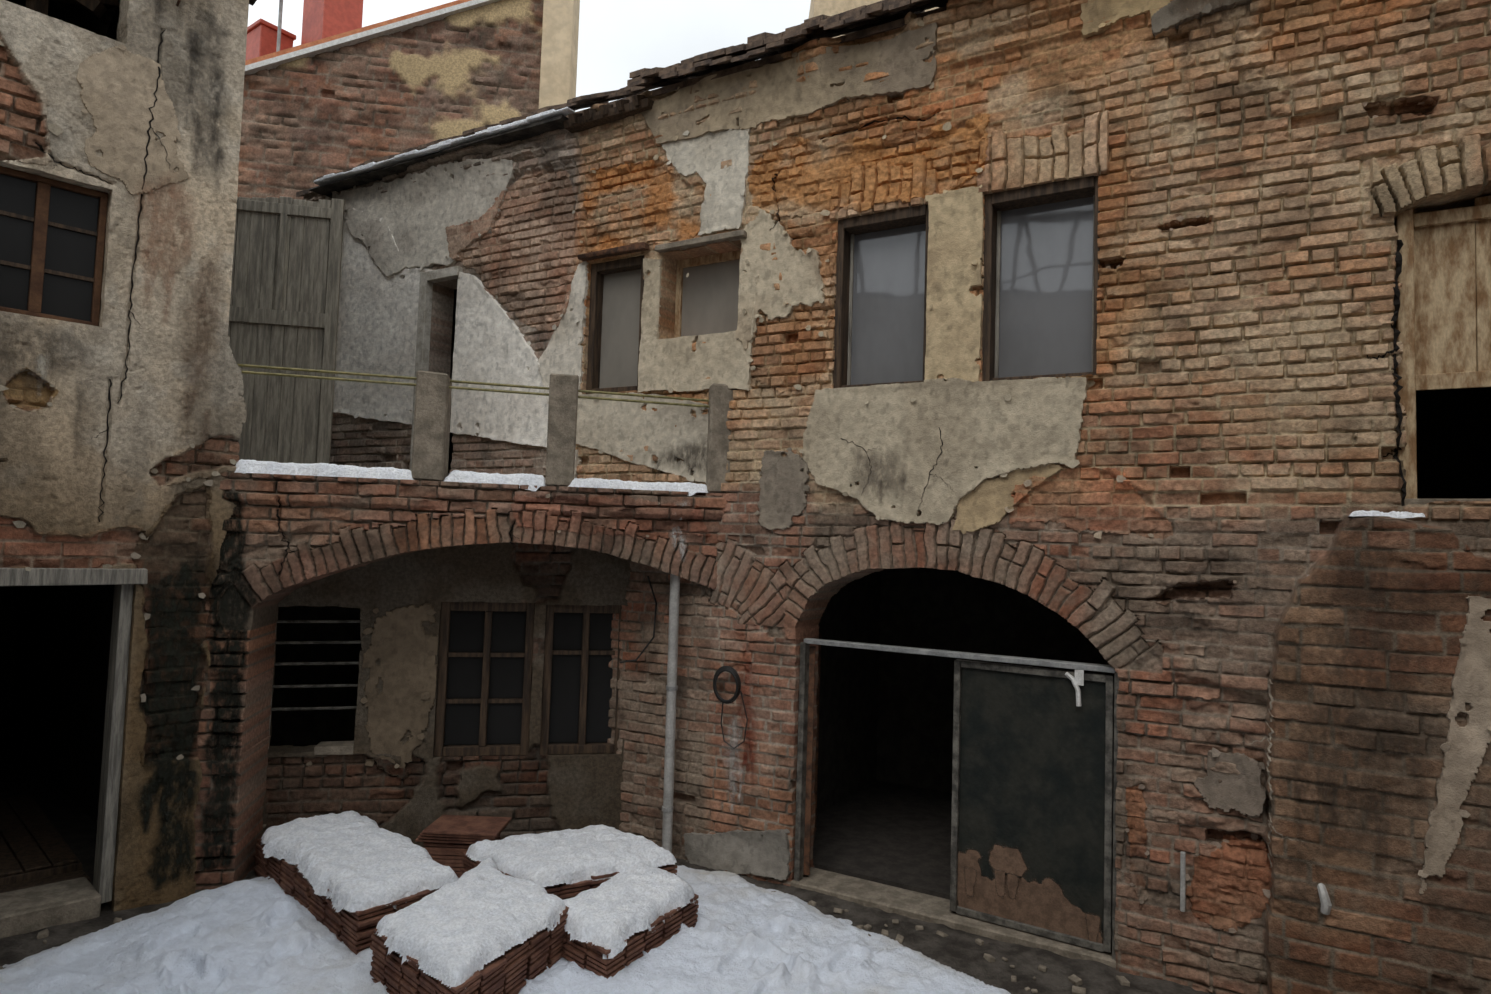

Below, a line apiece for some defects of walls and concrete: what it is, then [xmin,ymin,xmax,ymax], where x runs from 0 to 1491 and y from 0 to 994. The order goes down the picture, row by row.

spalling [0,39,64,165]
peeling [77,44,189,195]
crack [35,30,170,522]
peeling [326,20,1173,540]
spalling [1158,215,1212,232]
spalling [0,367,59,411]
spalling [0,436,239,767]
leakage [140,729,195,833]
spalling [1186,747,1274,934]
peeling [1418,596,1491,895]